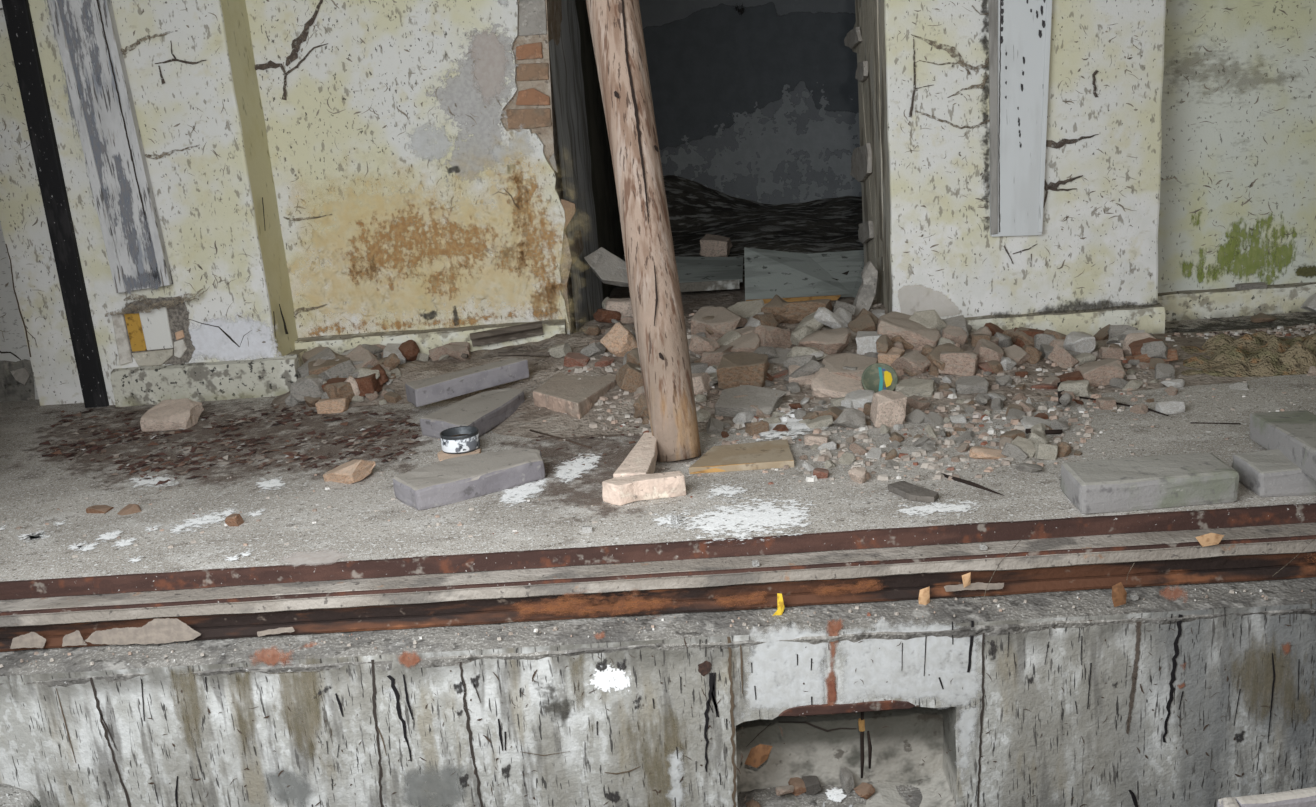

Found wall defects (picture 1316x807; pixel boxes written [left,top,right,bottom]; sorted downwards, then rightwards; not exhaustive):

peeling [409,0,552,187]
flaking render [45,0,277,366]
leakage [293,159,562,336]
flaking render [561,199,576,229]
crack [56,688,76,763]
crack [90,677,131,807]
crack [458,656,484,807]
corrosion [513,592,673,616]
spalling [0,586,1316,807]
corrosion [714,592,765,607]
corrosion [826,620,842,705]
corrosion [815,580,881,595]